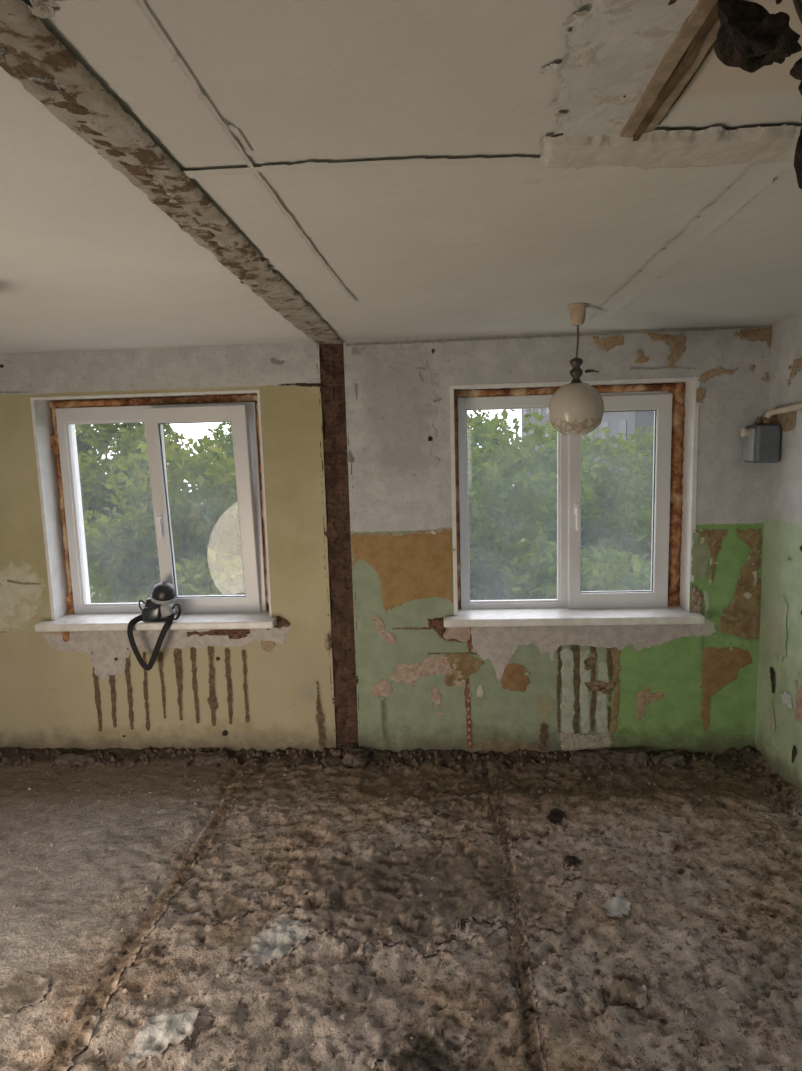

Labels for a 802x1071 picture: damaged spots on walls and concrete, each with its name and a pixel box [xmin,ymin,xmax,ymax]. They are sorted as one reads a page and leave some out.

peeling [0,43,260,291]
peeling [634,330,687,368]
peeling [734,327,771,349]
flaking render [317,343,769,751]
peeling [0,559,47,633]
peeling [42,616,292,680]